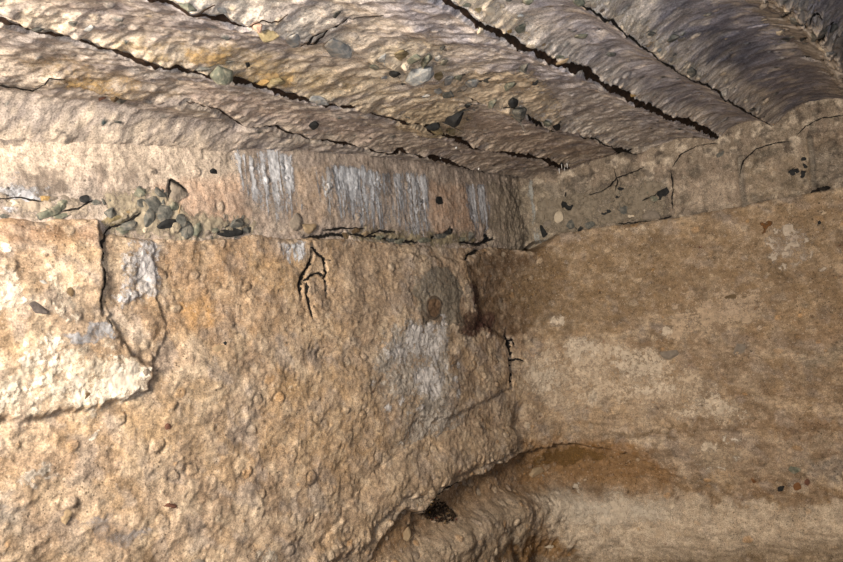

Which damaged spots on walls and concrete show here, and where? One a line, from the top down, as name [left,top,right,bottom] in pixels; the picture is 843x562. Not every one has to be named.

crack [0,78,65,92]
crack [0,17,211,79]
crack [301,15,384,47]
crack [186,76,570,175]
crack [442,0,718,225]
crack [582,1,843,176]
efflorescence [234,149,302,219]
efflorescence [316,165,430,236]
efflorescence [465,183,490,236]
crack [100,213,140,326]
crack [297,227,493,317]
leakage [371,266,495,448]